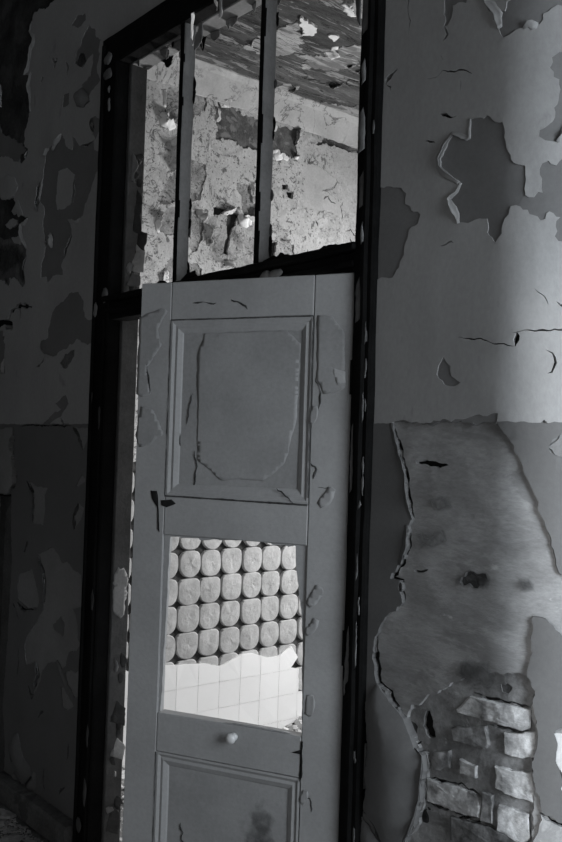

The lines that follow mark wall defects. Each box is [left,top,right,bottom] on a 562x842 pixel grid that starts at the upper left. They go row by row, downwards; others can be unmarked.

peeling [483,0,562,37]
flaking render [0,0,54,163]
peeling [39,116,99,282]
peeling [126,87,179,291]
peeling [157,258,202,283]
peeling [188,159,256,268]
flaking render [216,99,258,150]
peeling [259,223,294,278]
peeling [378,186,420,279]
peeling [435,116,562,242]
crack [466,329,562,346]
flaking render [375,413,562,842]